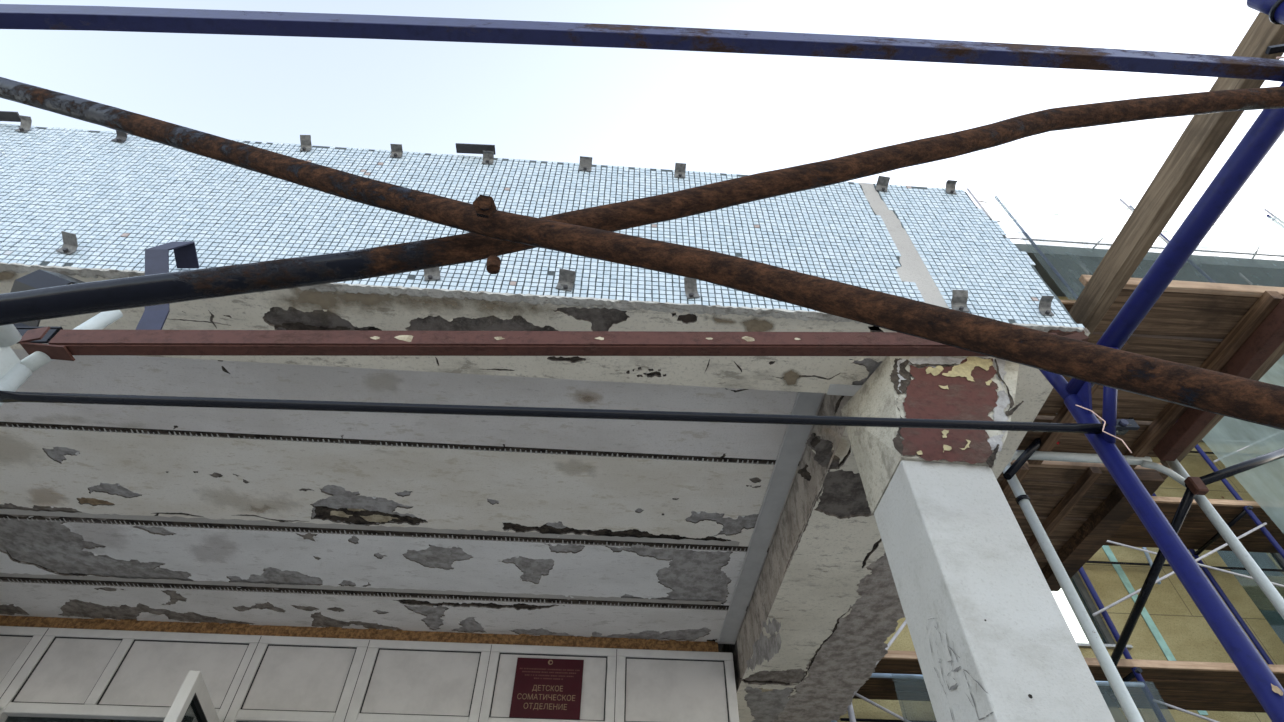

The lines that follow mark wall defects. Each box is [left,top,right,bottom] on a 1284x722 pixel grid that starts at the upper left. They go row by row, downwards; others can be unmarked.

spalling [263,307,382,331]
spalling [407,307,629,331]
spalling [849,356,1024,468]
peeling [43,447,80,462]
spalling [798,433,871,517]
peeling [300,485,426,543]
peeling [0,483,402,630]
peeling [404,544,472,569]
peeling [502,511,759,603]
peeling [399,595,574,633]
spalling [740,539,905,722]